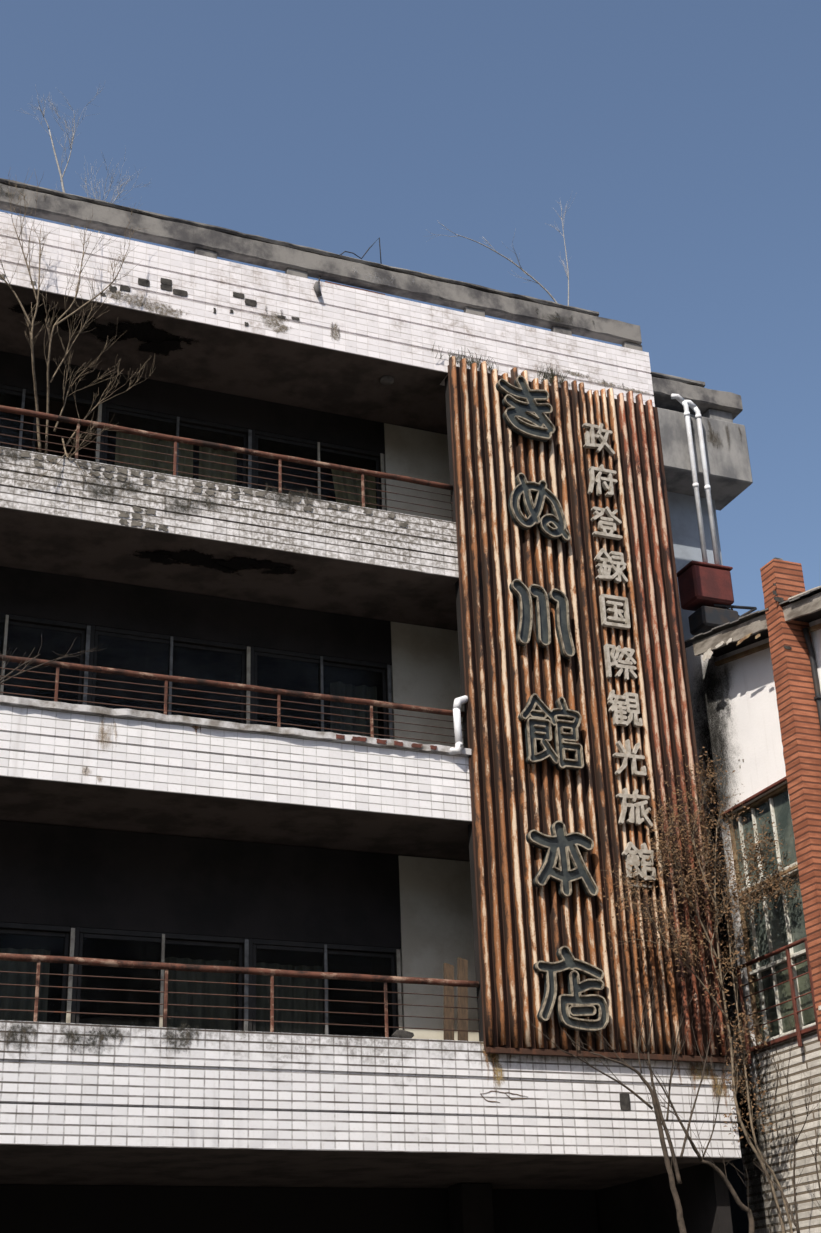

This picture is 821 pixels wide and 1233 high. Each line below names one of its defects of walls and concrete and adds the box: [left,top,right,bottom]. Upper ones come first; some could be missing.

peeling [100,278,188,297]
peeling [213,292,257,313]
peeling [9,300,198,356]
mould [83,474,140,500]
leakage [163,491,216,512]
mould [699,668,743,1038]
leakage [6,1025,36,1046]
mould [66,1027,123,1049]
leakage [164,1024,198,1050]